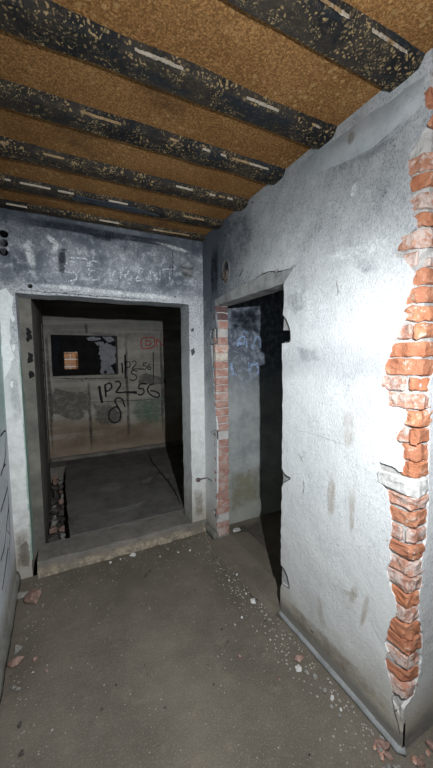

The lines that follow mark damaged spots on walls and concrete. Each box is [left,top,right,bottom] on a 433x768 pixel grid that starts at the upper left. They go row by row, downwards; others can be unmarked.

flaking render [87,336,116,374]
spalling [377,70,433,710]